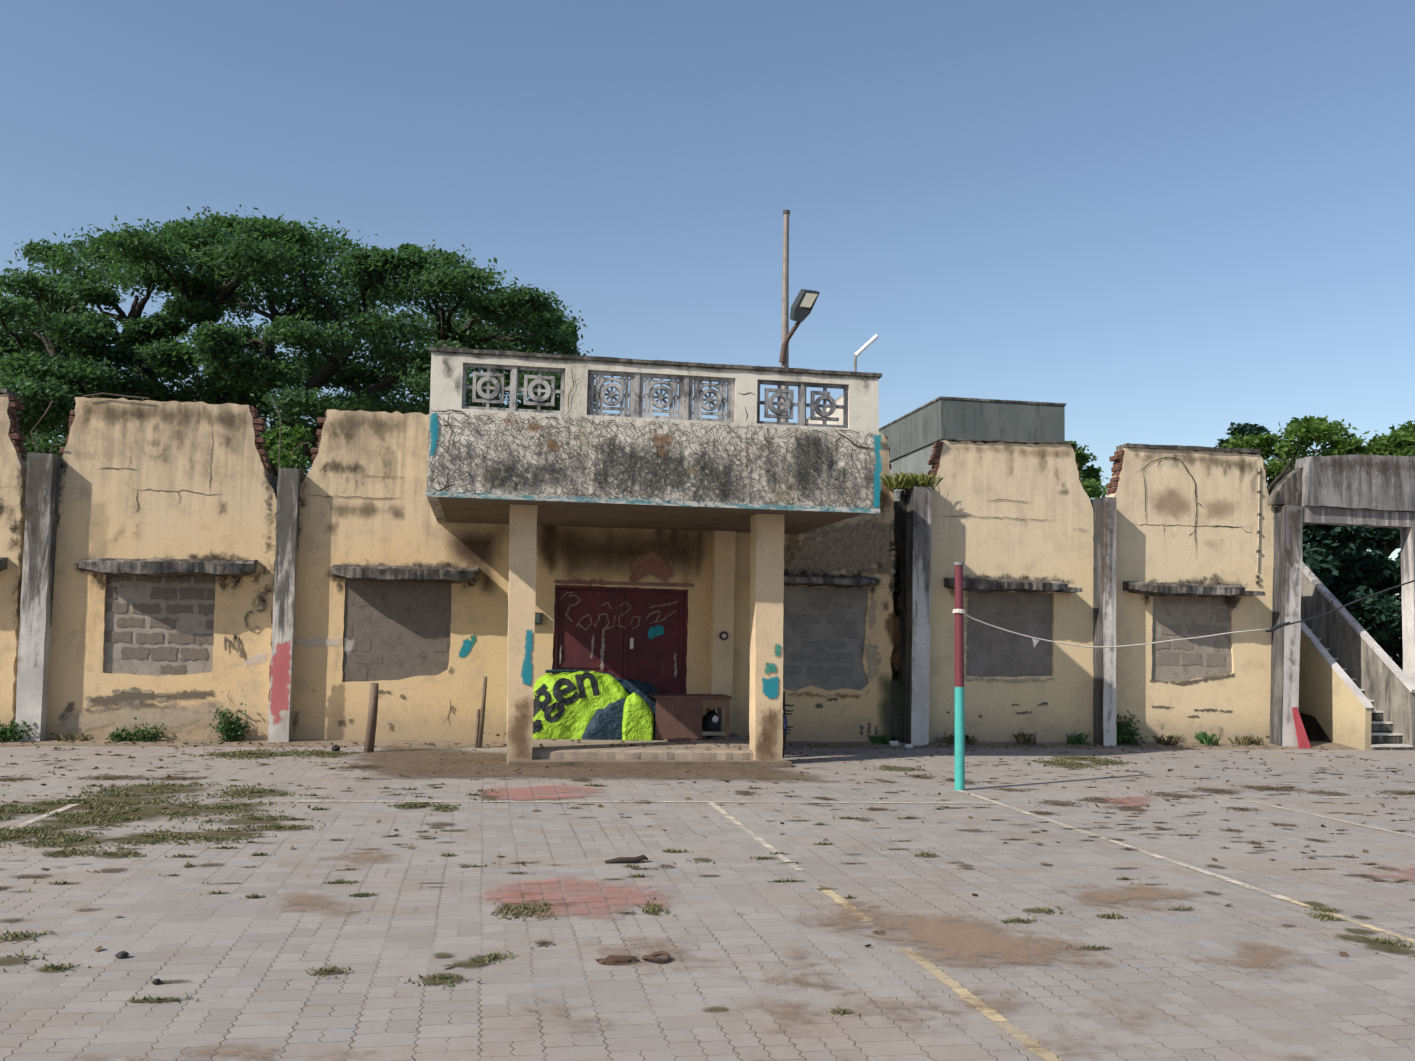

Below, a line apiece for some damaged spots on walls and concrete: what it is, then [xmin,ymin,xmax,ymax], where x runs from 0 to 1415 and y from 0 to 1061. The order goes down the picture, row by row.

leakage [0,470,25,560]
spalling [7,395,27,461]
spalling [249,406,271,469]
leakage [486,452,565,490]
crack [309,368,892,513]
leakage [597,439,740,502]
leakage [767,436,845,498]
peeling [784,519,895,575]
crack [1129,457,1252,542]
spalling [885,598,902,669]